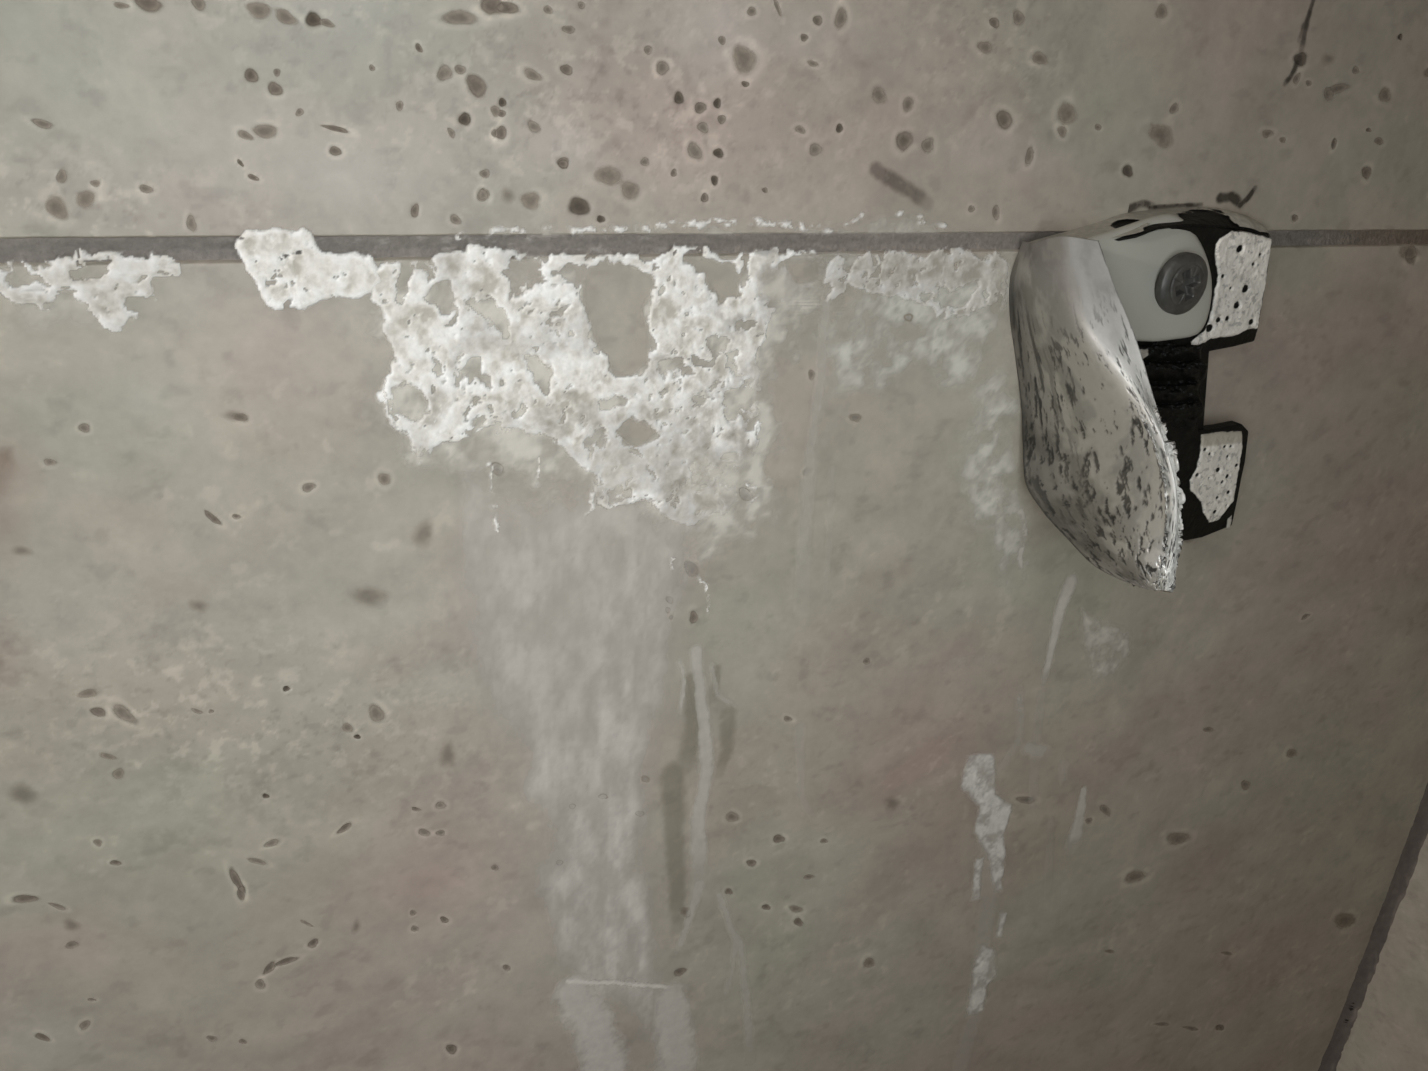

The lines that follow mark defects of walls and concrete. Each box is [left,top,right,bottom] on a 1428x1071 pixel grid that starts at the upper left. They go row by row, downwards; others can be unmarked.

spalling [115,0,161,11]
spalling [247,3,334,27]
spalling [444,0,518,24]
spalling [719,36,754,87]
spalling [245,69,283,95]
spalling [437,65,506,139]
spalling [238,125,276,140]
spalling [322,125,347,155]
spalling [675,92,726,159]
spalling [46,170,99,218]
spalling [570,198,628,234]
leakage [464,486,712,1071]